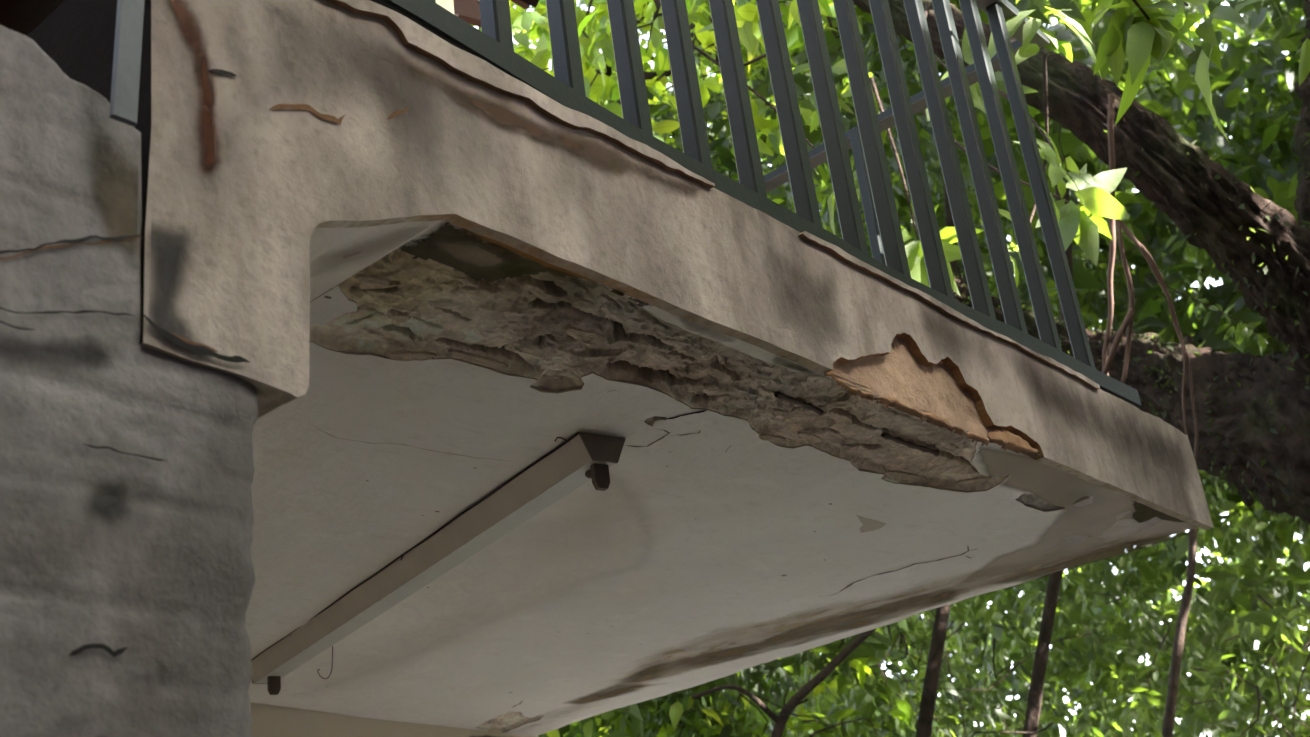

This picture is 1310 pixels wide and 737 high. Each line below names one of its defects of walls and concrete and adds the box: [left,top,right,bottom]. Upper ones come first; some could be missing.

rust [171,0,219,171]
crack [270,104,346,124]
crack [326,0,715,189]
crack [0,234,143,260]
spalling [309,249,1041,491]
crack [624,410,707,452]
spalling [1016,492,1089,510]
damp [570,449,1197,704]
crack [820,546,976,597]
crack [69,643,128,657]